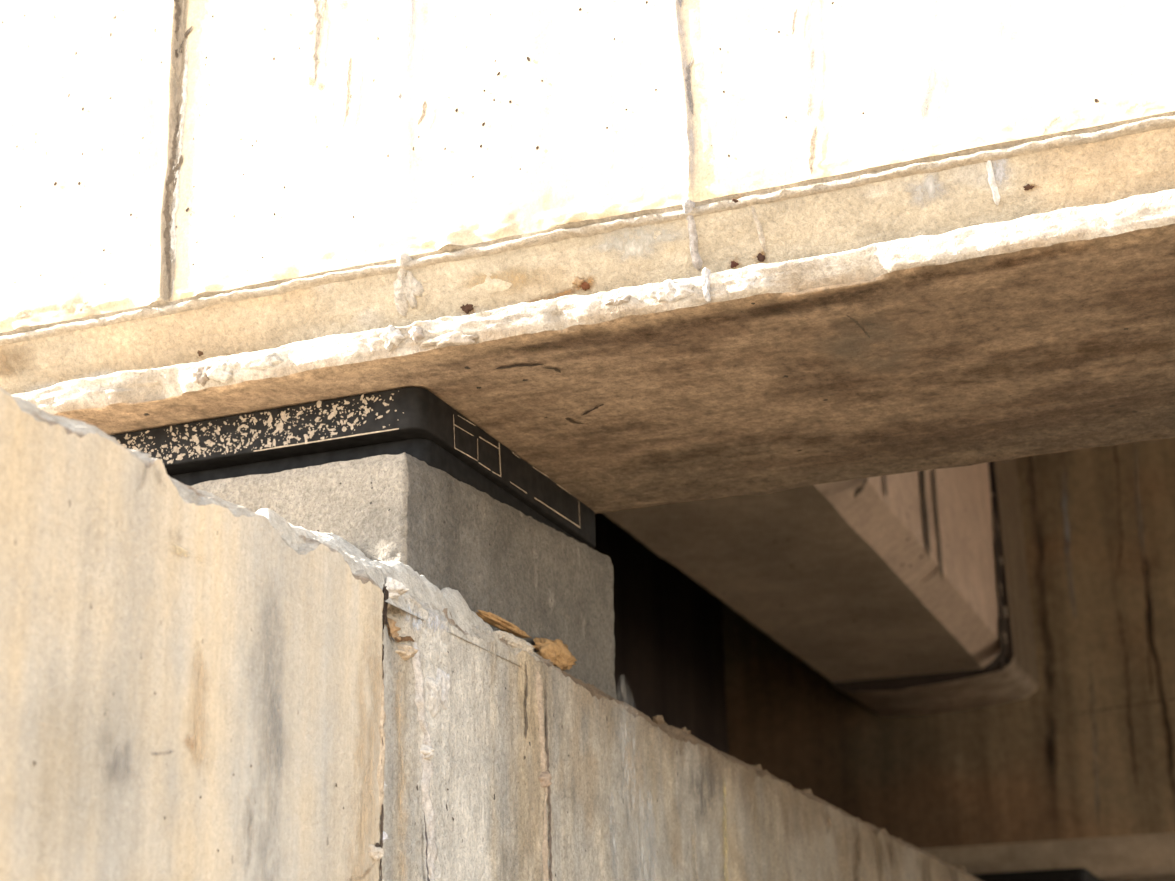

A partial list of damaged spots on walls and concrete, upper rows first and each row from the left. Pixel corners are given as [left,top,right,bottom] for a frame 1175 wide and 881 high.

damp [792,0,817,174]
spalling [0,387,157,468]
spalling [168,475,263,518]
crack [359,586,388,881]
spalling [281,533,981,881]